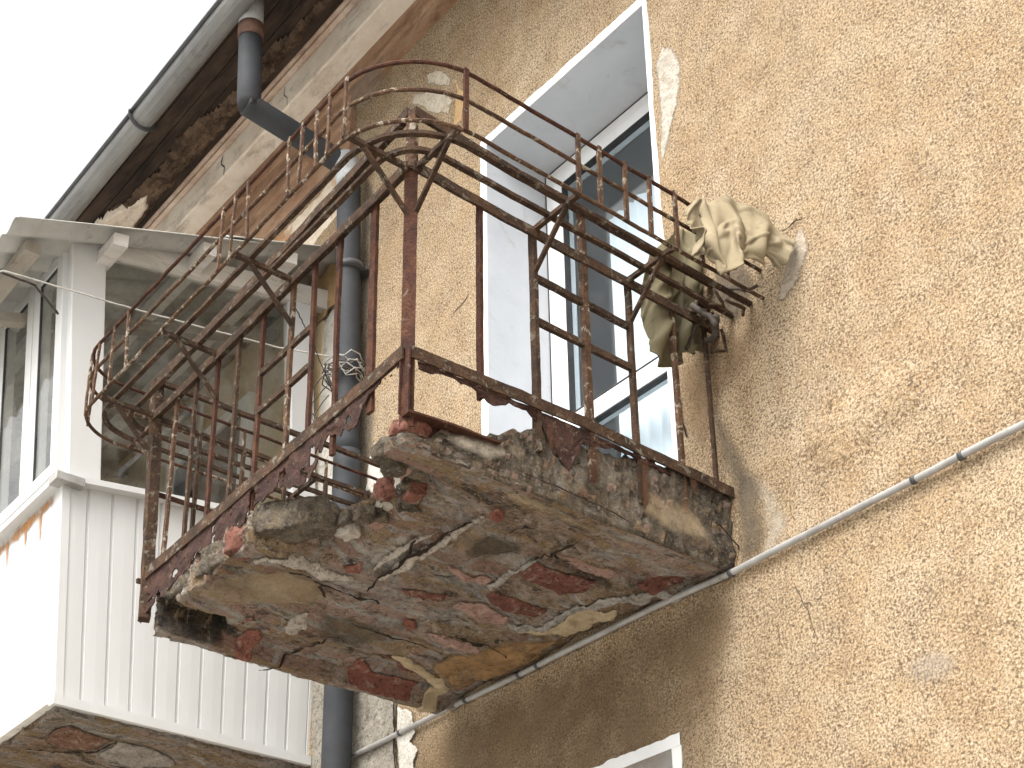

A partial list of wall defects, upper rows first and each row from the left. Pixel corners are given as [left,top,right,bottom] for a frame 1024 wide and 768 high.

peeling [412,70,463,124]
flaking render [103,90,239,228]
peeling [310,264,336,416]
corrosion [0,499,53,568]
spalling [163,419,505,600]
crack [289,521,507,658]
spalling [401,557,694,637]
crack [532,543,576,562]
water stain [724,437,759,553]
spalling [46,726,175,768]
flaking render [311,681,324,768]
flaking render [347,655,450,768]